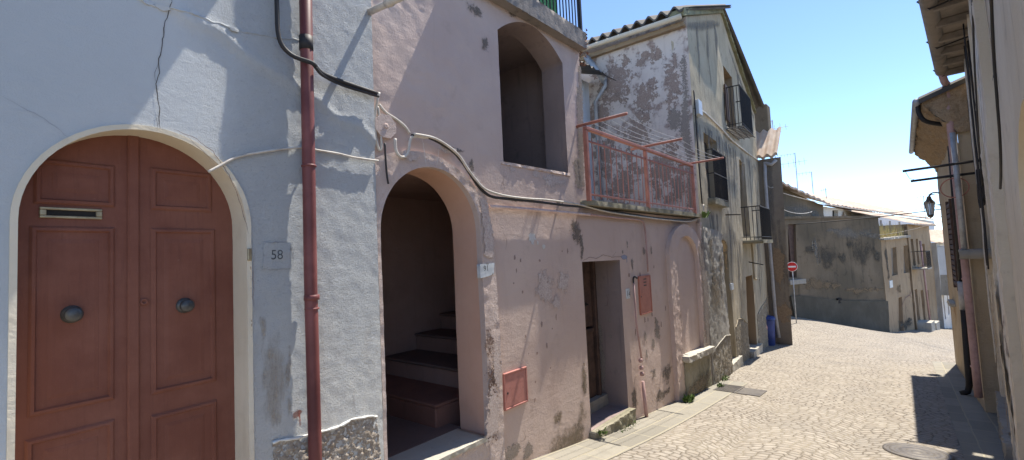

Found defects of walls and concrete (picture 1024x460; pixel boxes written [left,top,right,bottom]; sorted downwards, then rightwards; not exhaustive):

crack [155,2,294,301]
flaking render [573,46,696,208]
water stain [571,221,584,259]
flaking render [699,239,792,384]
flaking render [272,434,308,460]
flaking render [321,415,381,460]